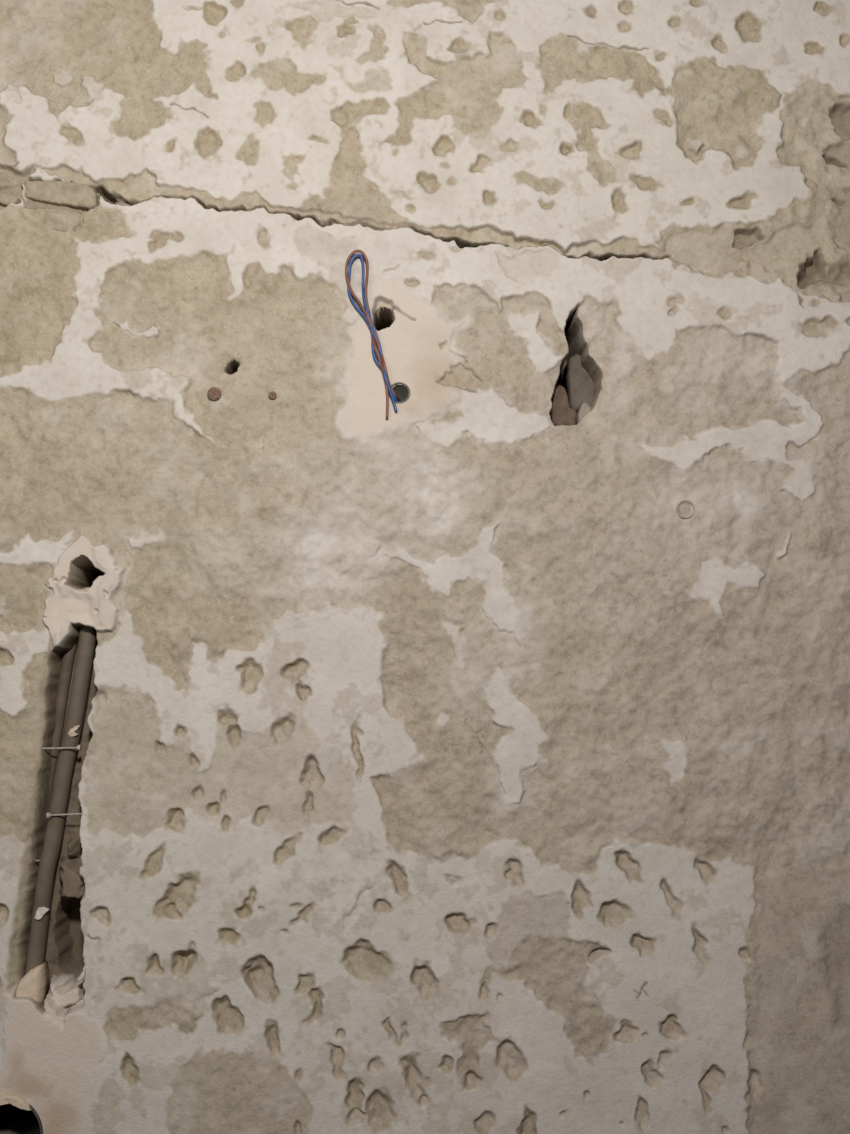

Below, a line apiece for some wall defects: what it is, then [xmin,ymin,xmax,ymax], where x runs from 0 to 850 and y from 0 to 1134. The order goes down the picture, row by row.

spalling [0,193,139,378]
spalling [0,0,246,171]
crack [0,164,672,261]
spalling [224,0,850,339]
crack [781,278,806,309]
spalling [0,230,850,1134]